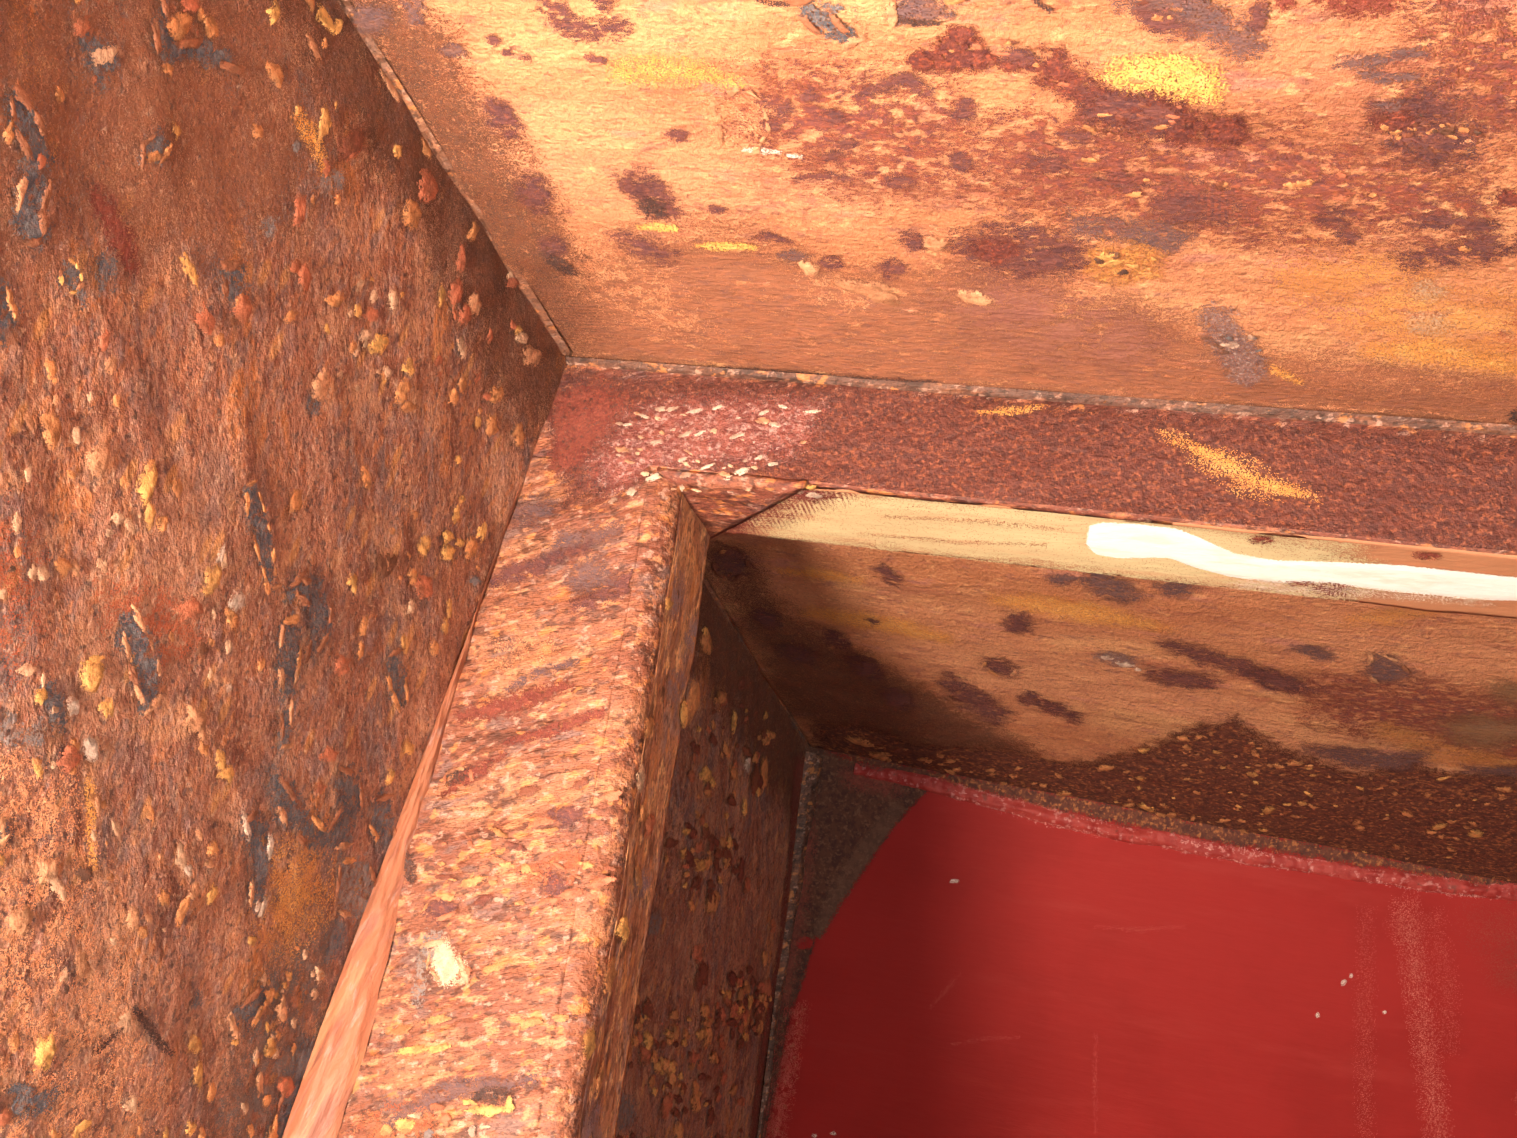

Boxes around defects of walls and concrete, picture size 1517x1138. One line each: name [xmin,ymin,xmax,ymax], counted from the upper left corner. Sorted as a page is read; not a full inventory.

corrosion [0,0,1517,656]
corrosion [333,612,369,677]
corrosion [453,657,607,748]
corrosion [0,487,341,1138]
corrosion [515,785,540,798]
corrosion [435,815,643,917]
corrosion [570,775,591,791]
corrosion [602,571,1517,1138]
corrosion [390,927,513,1056]
corrosion [347,1069,540,1138]